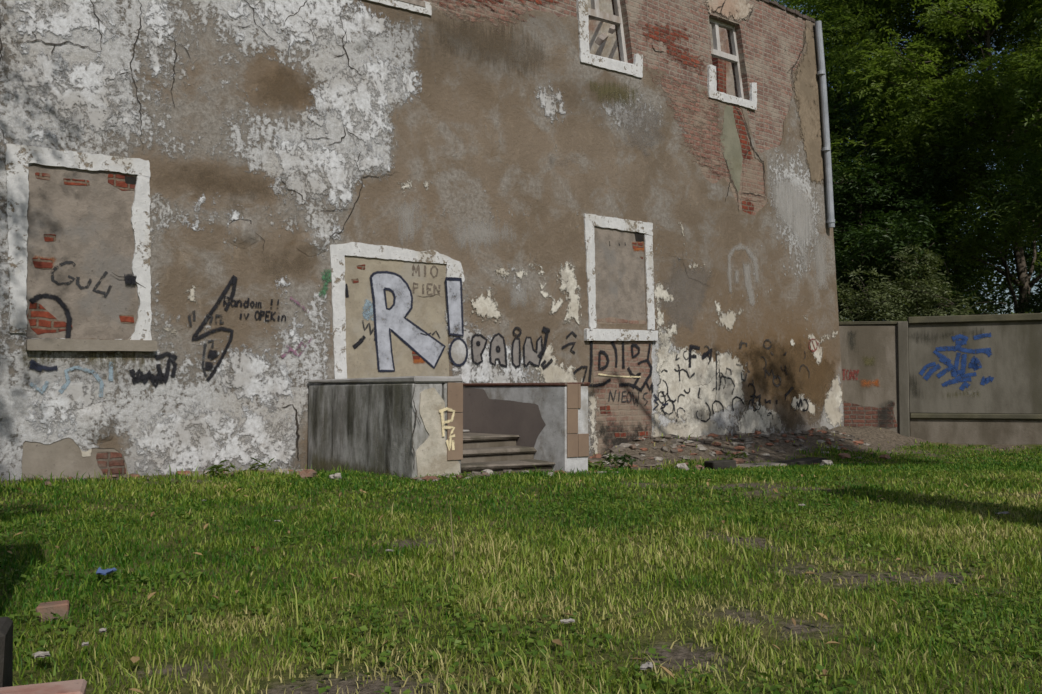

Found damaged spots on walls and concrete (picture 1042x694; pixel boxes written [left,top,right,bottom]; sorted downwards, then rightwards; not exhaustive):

crack [0,0,105,59]
crack [119,0,191,150]
crack [234,0,314,57]
crack [334,9,362,76]
flaking render [635,20,767,215]
peeling [793,27,826,187]
crack [281,126,394,240]